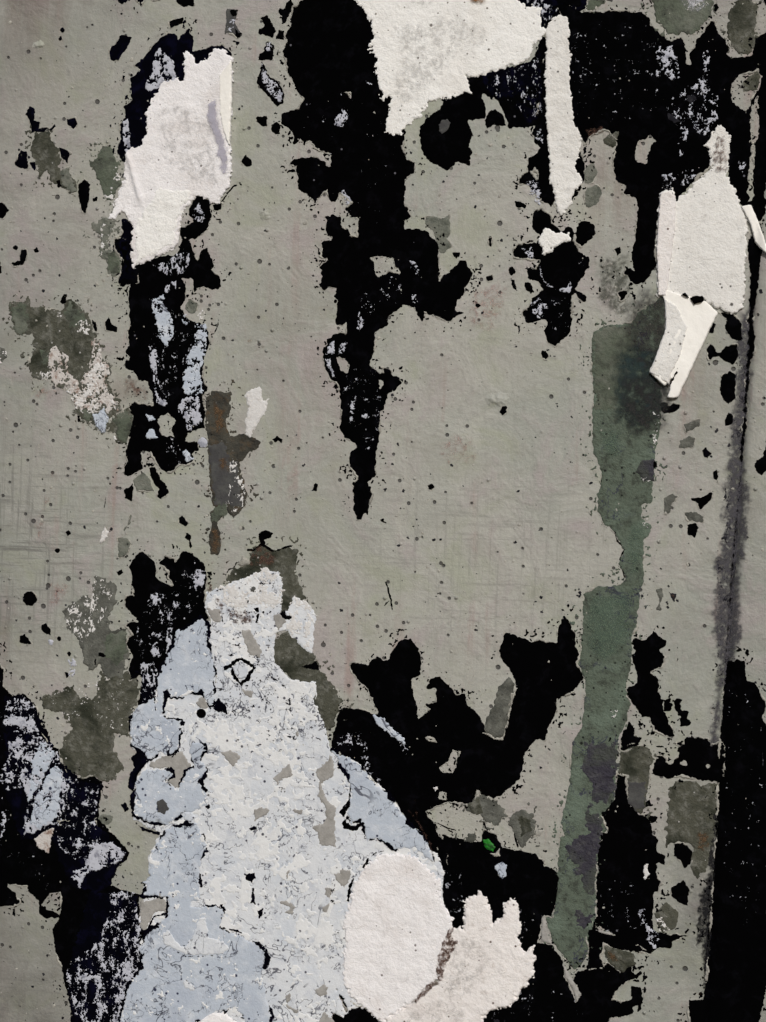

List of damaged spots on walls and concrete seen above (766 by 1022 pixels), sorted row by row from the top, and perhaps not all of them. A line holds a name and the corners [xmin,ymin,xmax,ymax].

peeling [419,33,596,361]
peeling [0,9,284,564]
peeling [256,0,482,521]
peeling [706,310,742,426]
peeling [670,418,712,458]
peeling [657,493,679,523]
peeling [684,470,719,538]
peeling [41,623,61,645]